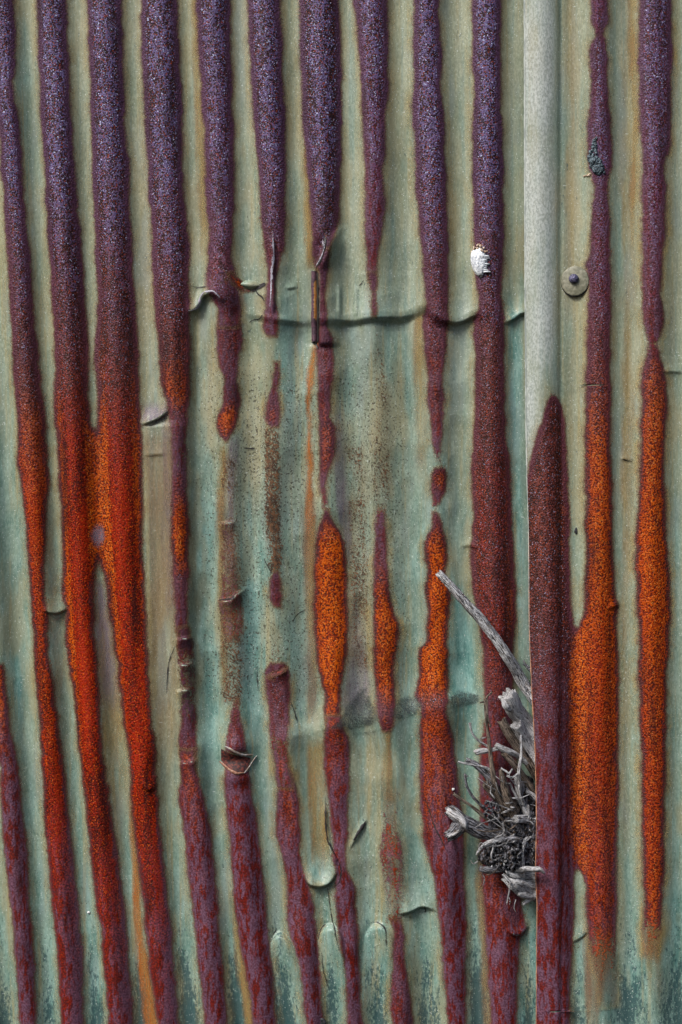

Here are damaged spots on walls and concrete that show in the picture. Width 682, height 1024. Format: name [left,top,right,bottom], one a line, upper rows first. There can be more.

rust [0,0,278,1024]
rust [246,0,404,1024]
rust [379,811,416,1024]
rust [409,0,676,1024]